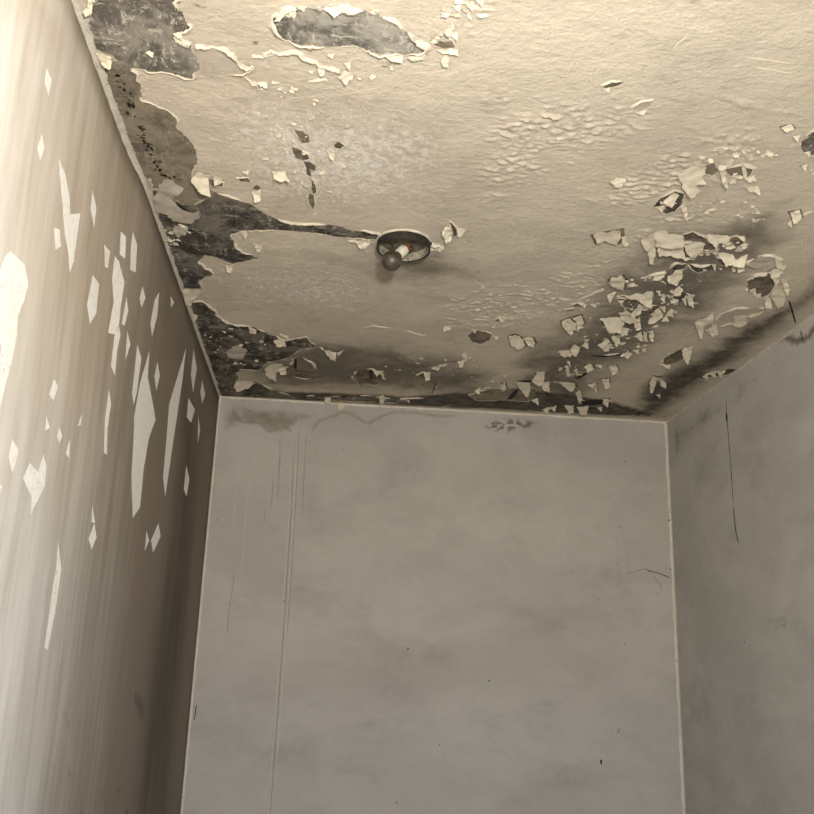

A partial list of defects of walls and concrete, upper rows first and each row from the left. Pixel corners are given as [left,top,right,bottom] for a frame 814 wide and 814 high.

leakage [113,74,181,180]
peeling [83,0,790,415]
leakage [735,225,761,254]
peeling [779,123,814,174]
leakage [276,247,789,416]
crack [726,405,739,545]